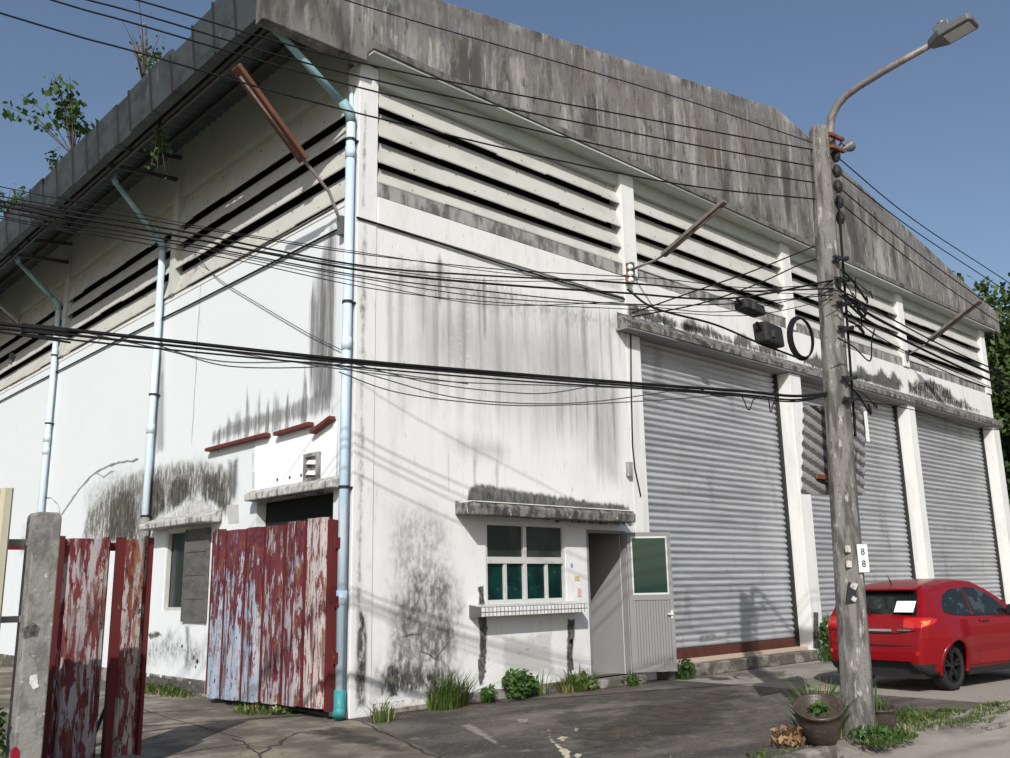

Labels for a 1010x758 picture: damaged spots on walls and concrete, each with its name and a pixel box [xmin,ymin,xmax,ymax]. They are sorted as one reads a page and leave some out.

damp [212,234,333,445]
mould [629,306,787,358]
mould [804,354,822,368]
mould [848,366,973,410]
damp [84,460,237,540]
damp [382,577,456,696]